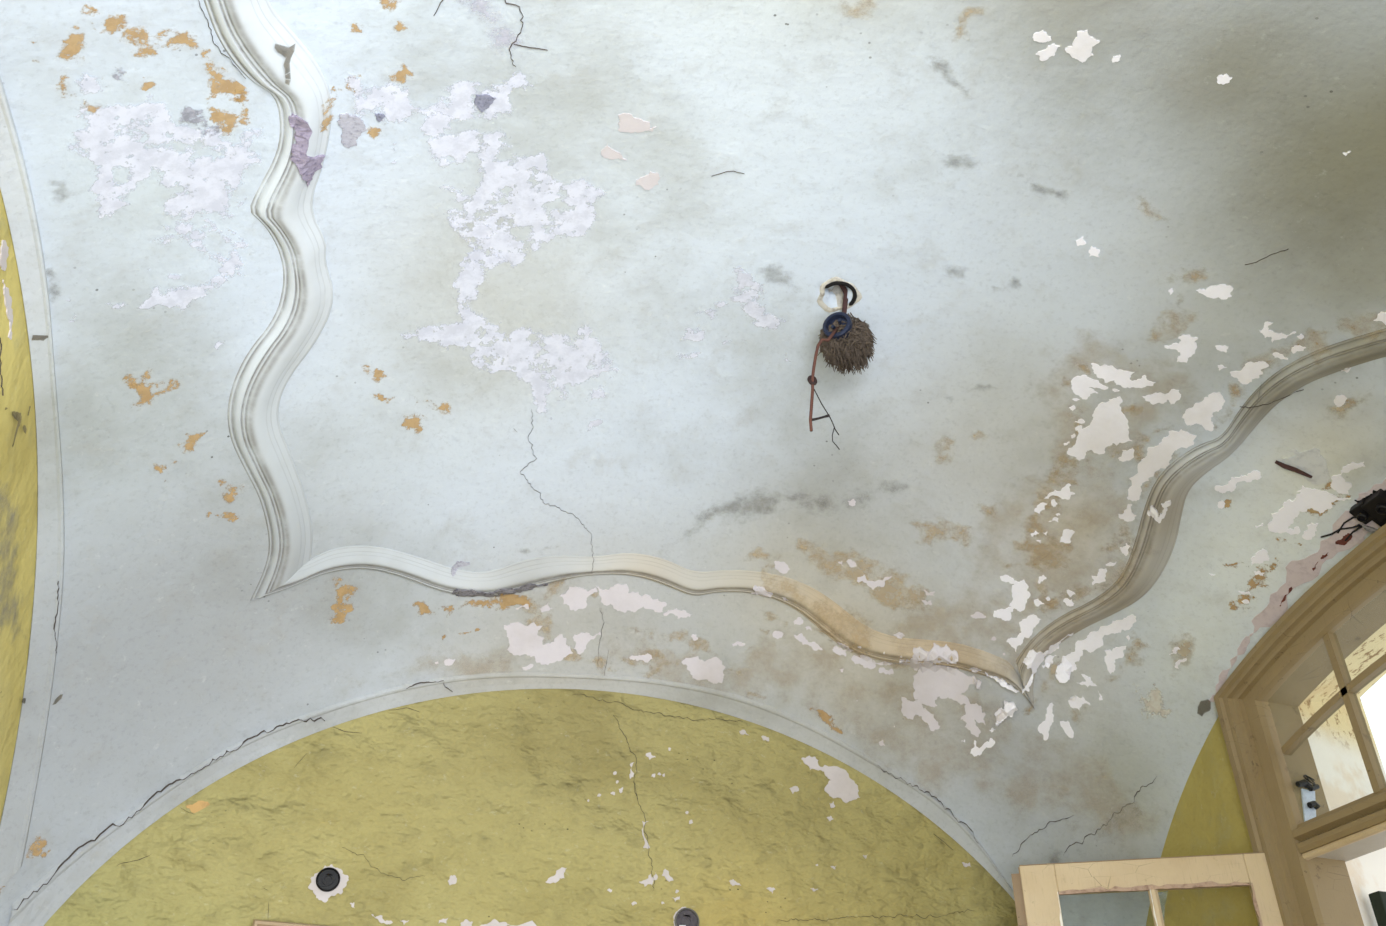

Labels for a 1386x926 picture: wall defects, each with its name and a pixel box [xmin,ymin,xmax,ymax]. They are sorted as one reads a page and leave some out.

crack [505,0,548,67]
spalling [288,113,325,187]
crack [0,338,8,396]
peeling [1215,321,1306,384]
crack [514,409,594,570]
peeling [1064,363,1225,523]
crack [396,680,453,712]
peeling [451,560,692,670]
peeling [772,575,1136,757]
spalling [1209,448,1386,702]
crack [15,717,358,910]
crack [1013,779,1155,854]